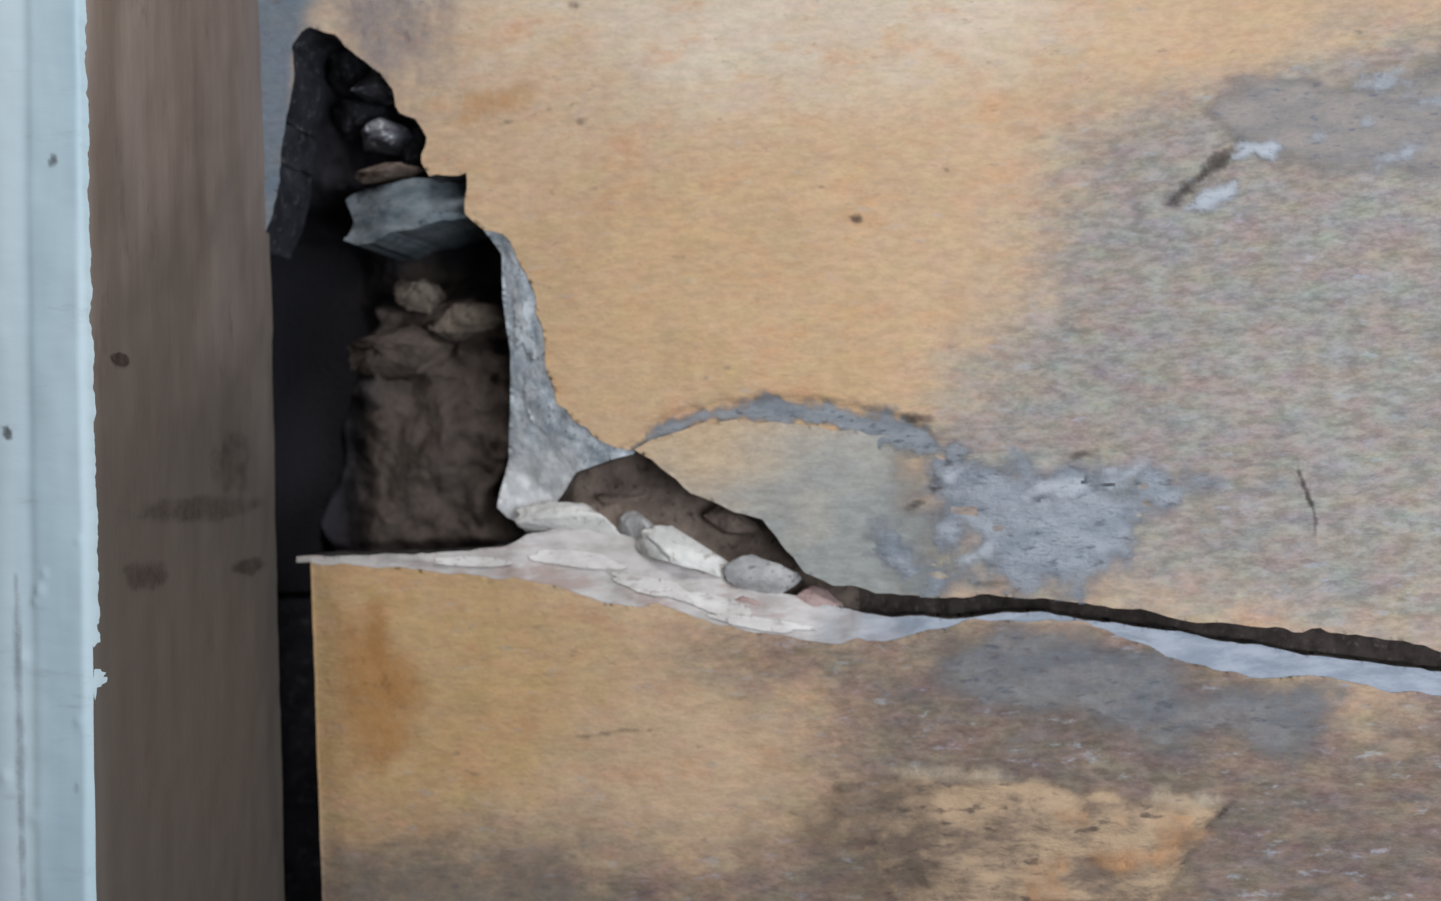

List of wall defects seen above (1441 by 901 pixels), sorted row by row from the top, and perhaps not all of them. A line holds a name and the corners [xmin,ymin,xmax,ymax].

spalling [270,47,1441,696]
crack [560,453,1441,667]